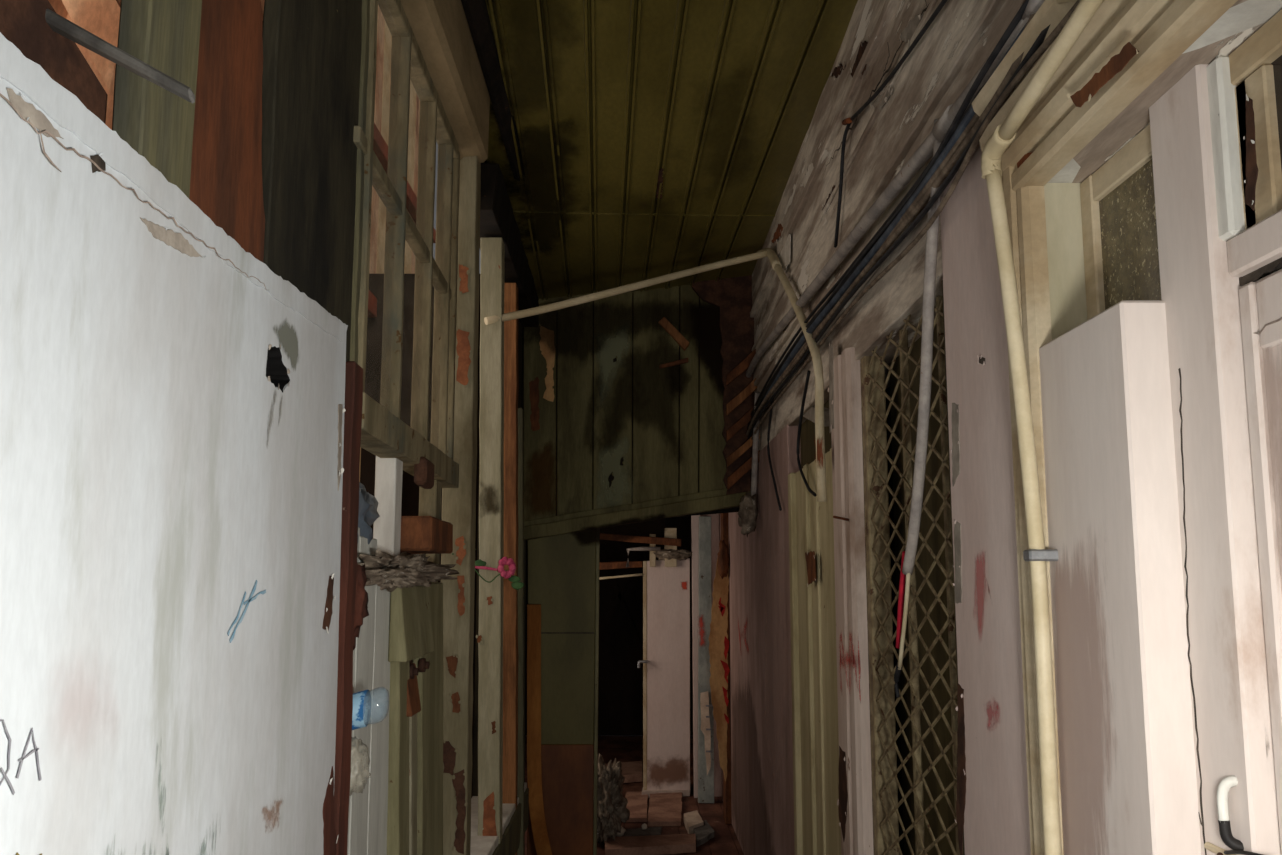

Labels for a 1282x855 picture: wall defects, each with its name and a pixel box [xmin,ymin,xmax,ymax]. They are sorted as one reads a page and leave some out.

crack [0,93,267,290]
spalling [266,344,290,393]
leakage [599,328,629,400]
leakage [597,439,628,507]